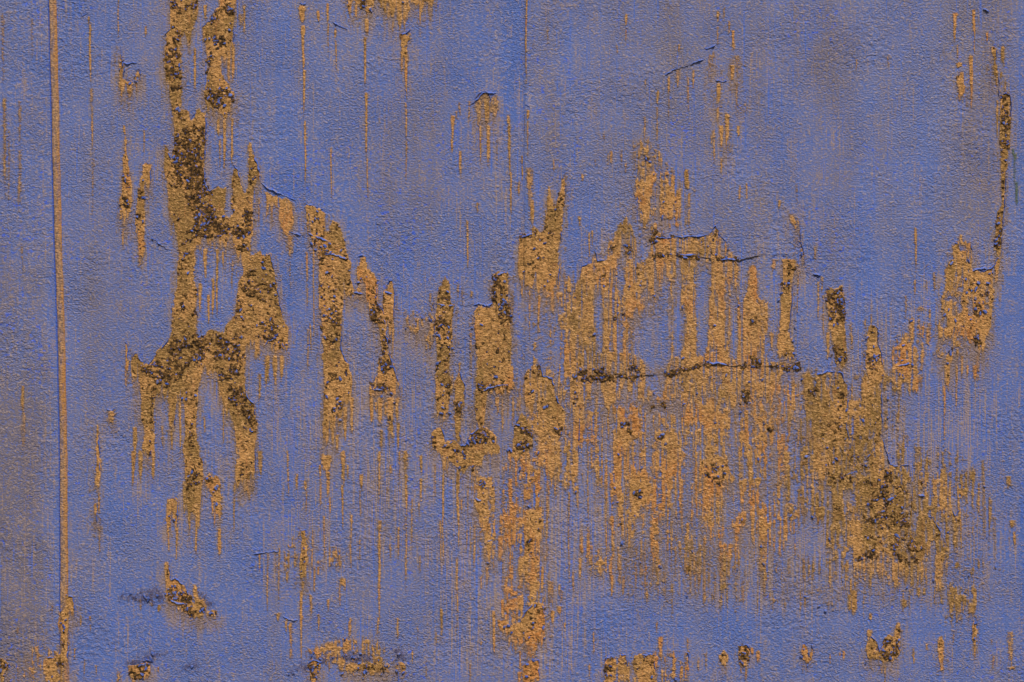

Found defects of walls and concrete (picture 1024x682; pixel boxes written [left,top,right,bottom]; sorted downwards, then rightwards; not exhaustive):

crack [645,253,777,265]
peeling [889,227,936,395]
crack [603,362,793,379]